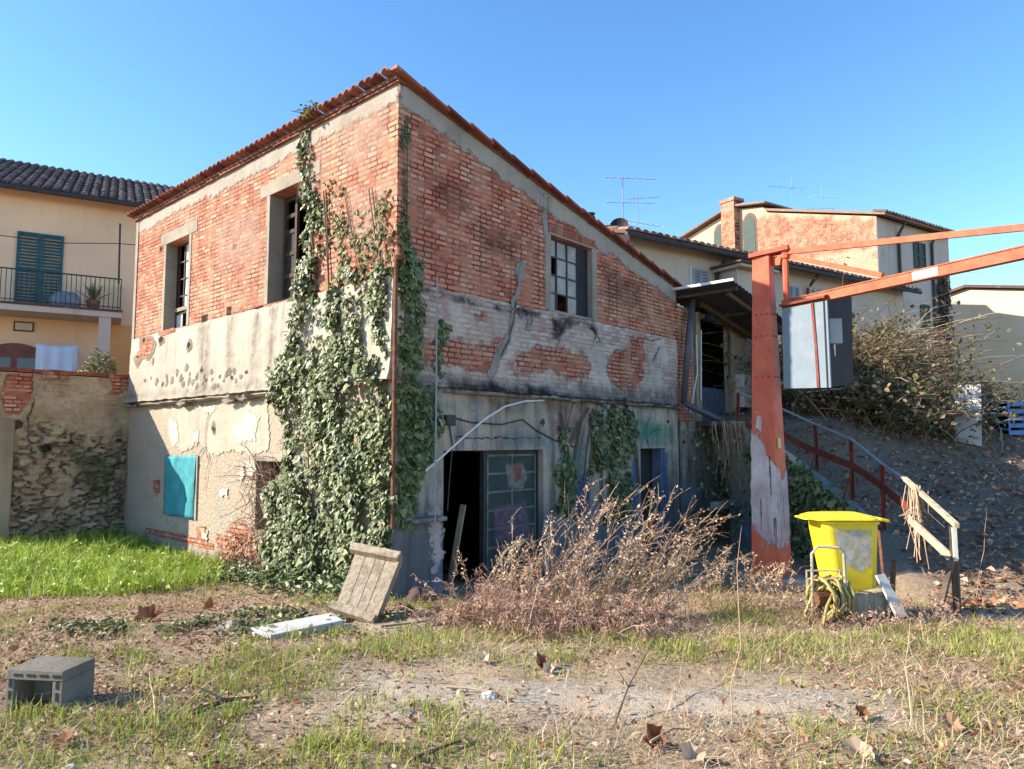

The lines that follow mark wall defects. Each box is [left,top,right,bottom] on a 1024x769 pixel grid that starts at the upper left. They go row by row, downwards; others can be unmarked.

flaking render [226,303,260,316]
crack [487,260,526,378]
flaking render [0,371,69,430]
flaking render [109,373,129,395]
peeling [133,327,270,481]
flaking render [416,336,502,373]
flaking render [512,344,592,383]
damp [451,382,665,408]
flaking render [607,337,646,392]
peeling [750,411,791,549]
flaking render [146,520,254,562]